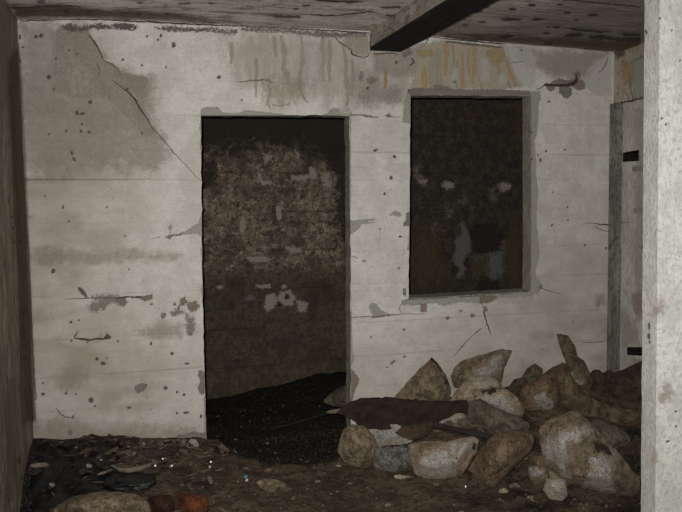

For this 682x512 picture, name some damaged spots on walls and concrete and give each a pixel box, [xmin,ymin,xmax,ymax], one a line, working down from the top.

peeling [20,19,367,134]
leakage [239,35,331,106]
rust [411,40,522,89]
crack [96,62,201,181]
spalling [324,107,372,209]
spalling [166,213,202,239]
spalling [350,37,561,401]
spalling [66,287,153,313]
spalling [161,285,203,336]